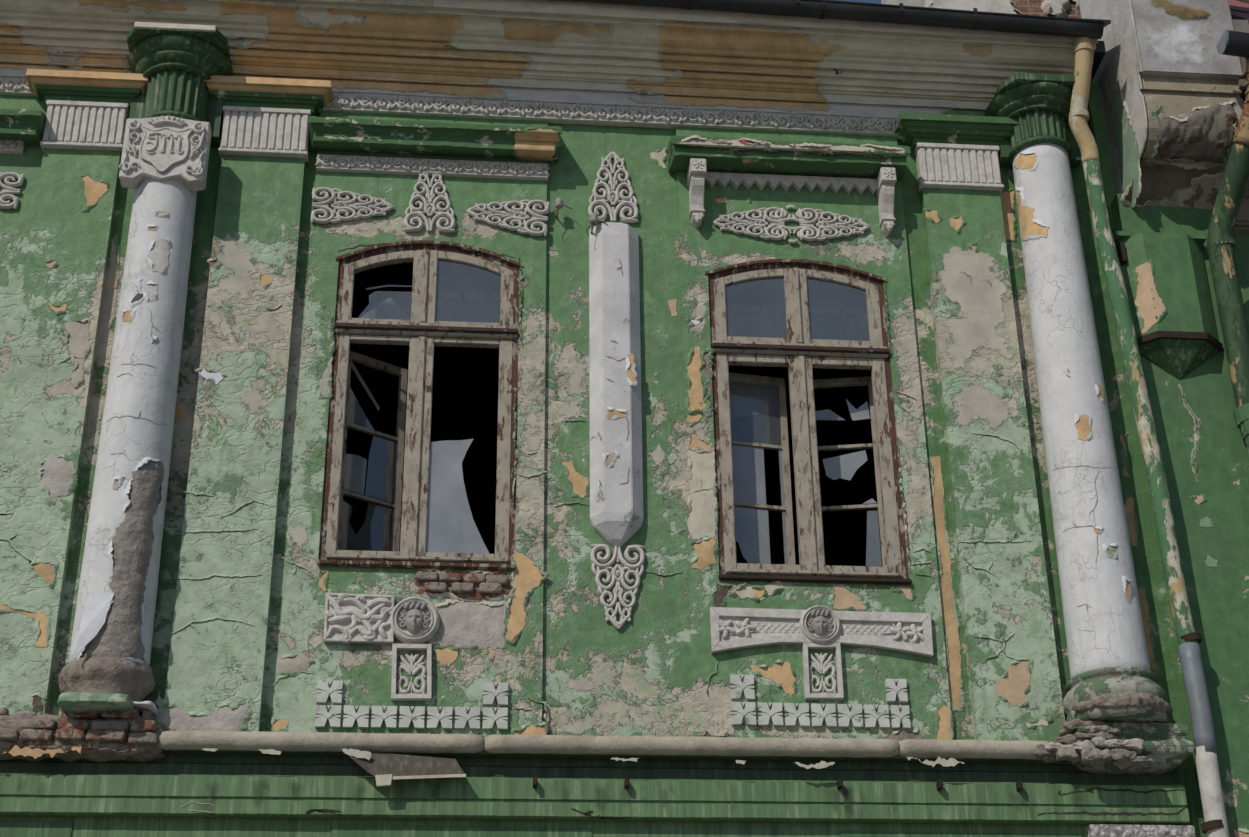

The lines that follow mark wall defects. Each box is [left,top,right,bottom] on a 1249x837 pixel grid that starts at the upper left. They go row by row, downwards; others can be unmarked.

peeling [221,0,614,100]
flaking render [924,0,1022,14]
flaking render [1108,84,1238,208]
peeling [1131,259,1167,335]
flaking render [75,457,164,664]
crack [164,616,255,639]
crack [176,491,268,534]
crack [175,557,314,580]
flaking render [414,553,549,669]
peeling [685,346,784,607]
spalling [0,692,252,763]
flaking render [995,660,1154,770]